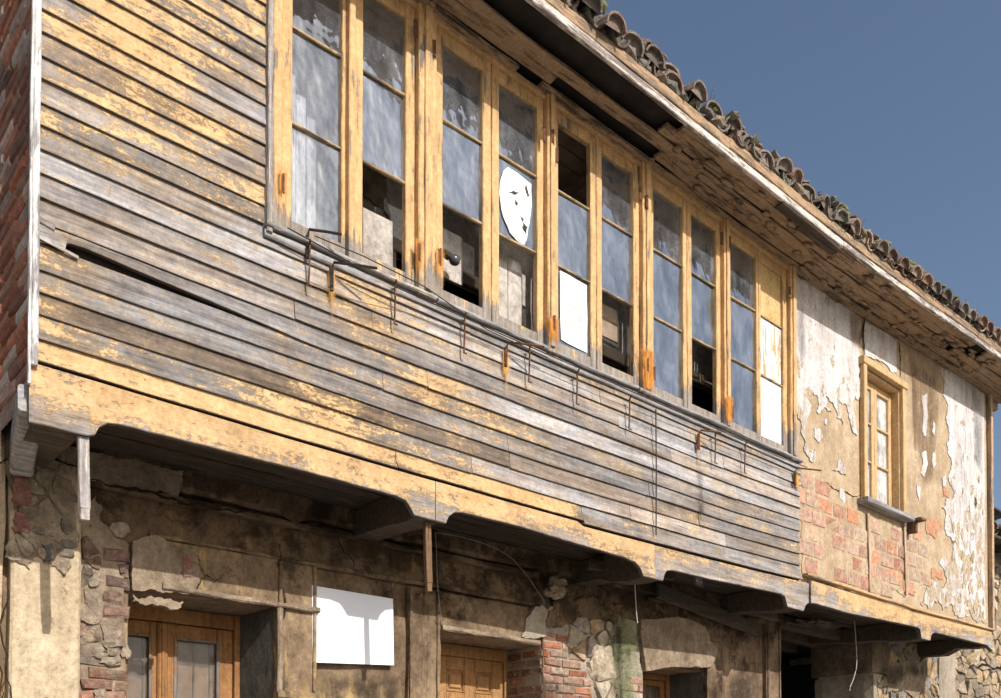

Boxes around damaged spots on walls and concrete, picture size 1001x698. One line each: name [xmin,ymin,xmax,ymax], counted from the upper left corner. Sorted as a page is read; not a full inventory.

flaking render [4,447,200,698]
flaking render [508,596,717,698]
corrosion [643,349,654,391]
peeling [797,277,986,624]